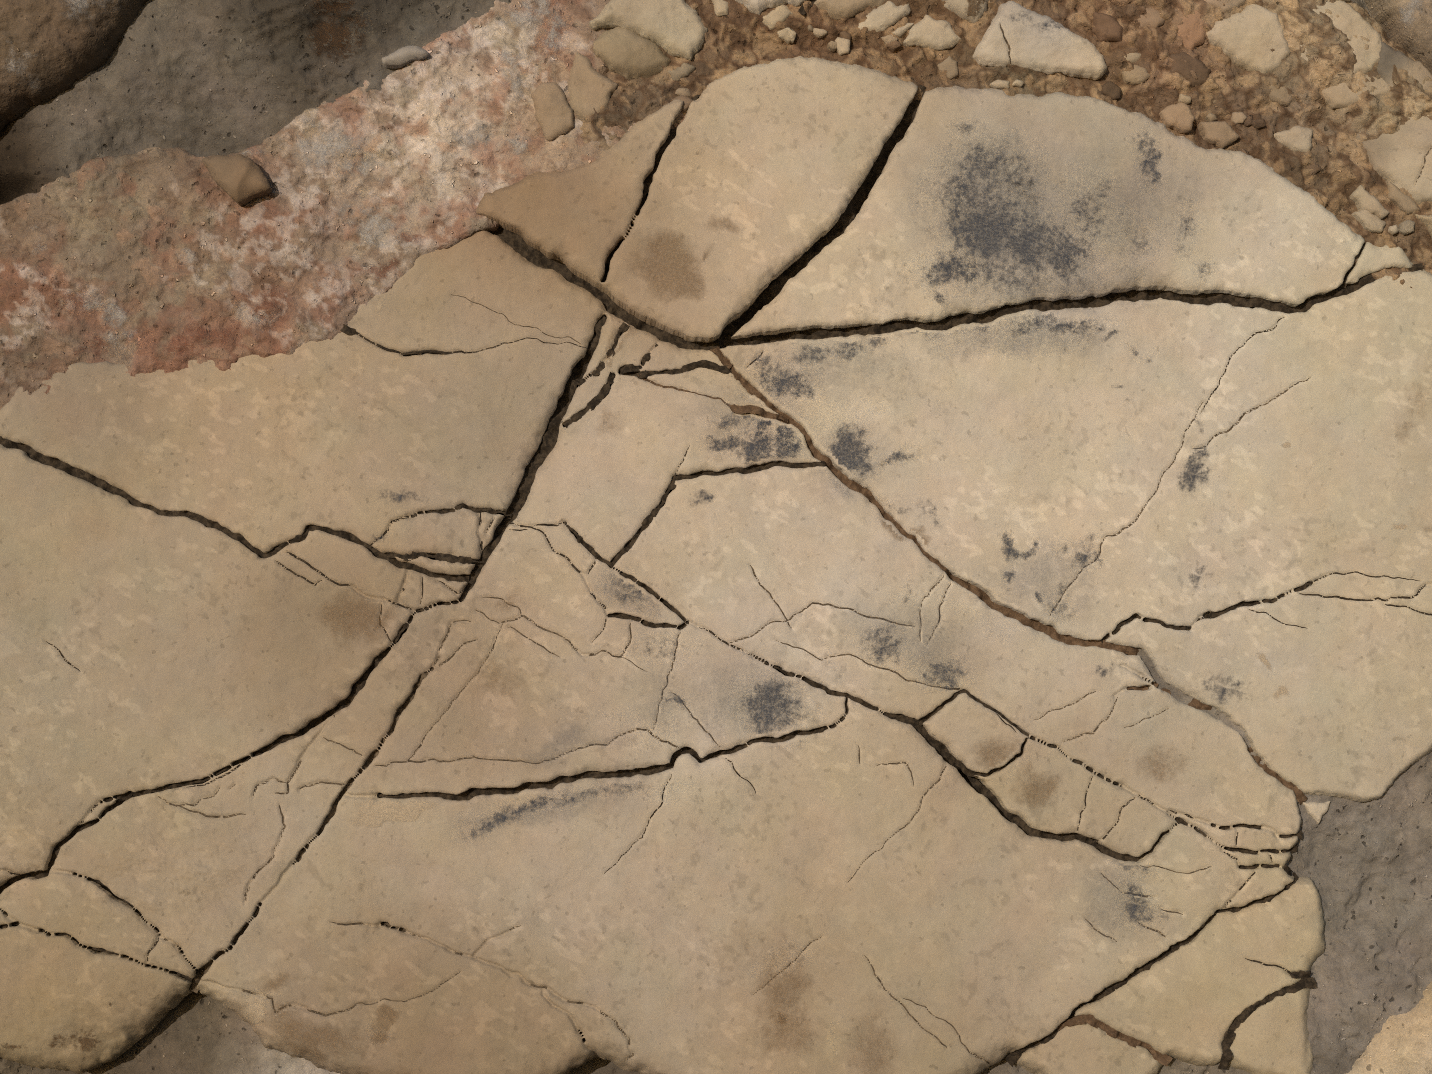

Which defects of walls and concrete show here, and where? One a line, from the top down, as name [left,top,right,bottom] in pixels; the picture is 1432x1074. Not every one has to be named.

crack [1000,24,1011,64]
crack [476,56,918,343]
crack [717,84,1366,348]
crack [0,226,1432,1074]